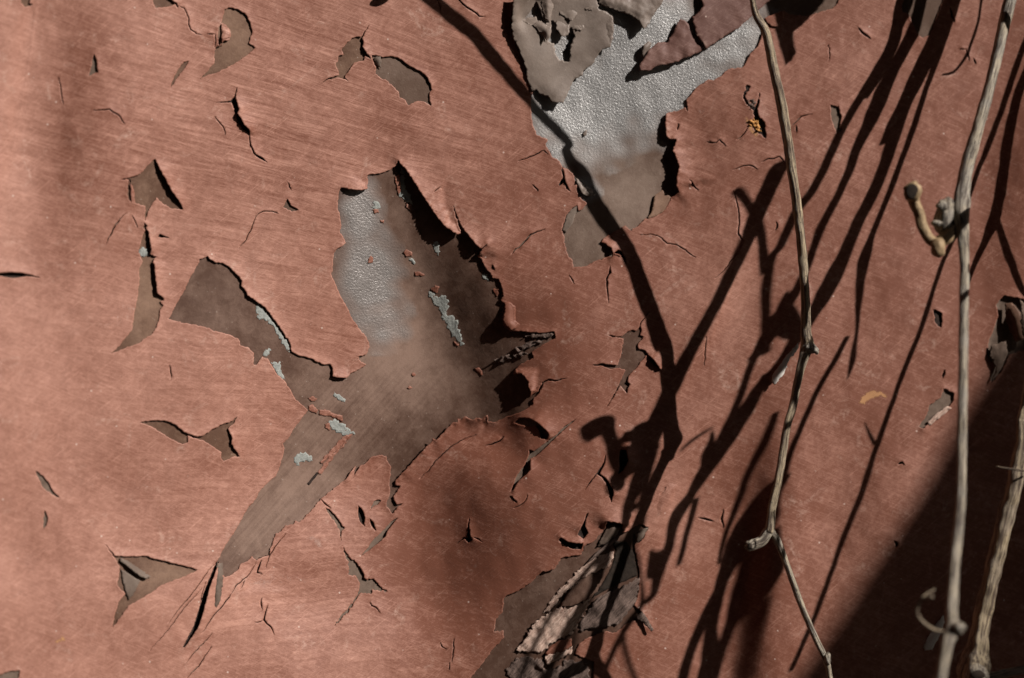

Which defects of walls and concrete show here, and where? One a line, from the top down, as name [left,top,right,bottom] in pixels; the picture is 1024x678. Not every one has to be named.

peeling [202,8,255,77]
peeling [324,27,432,106]
crack [217,88,266,162]
peeling [511,0,838,267]
crack [0,271,40,279]
peeling [112,159,566,608]
peeling [594,327,661,406]
peeling [987,295,1024,383]
peeling [109,550,196,625]
crack [157,542,279,677]
peeling [335,551,388,625]
peeling [471,521,653,678]